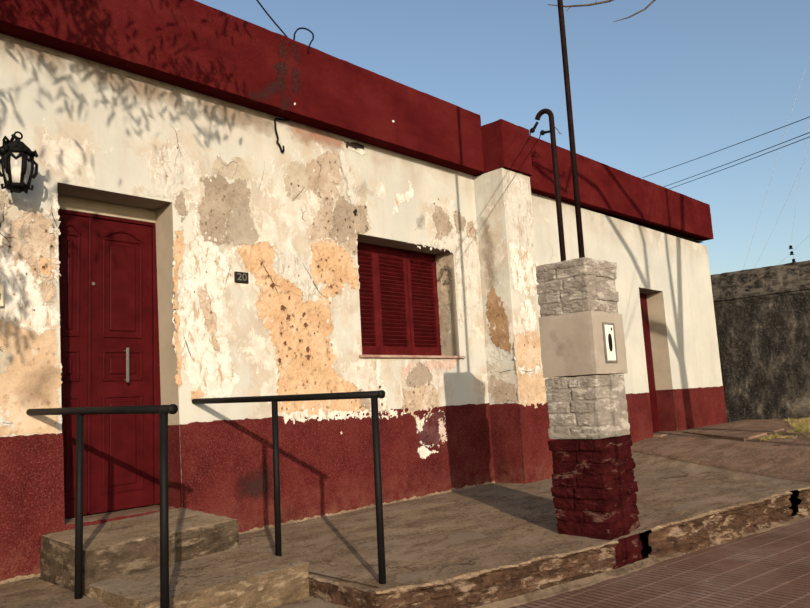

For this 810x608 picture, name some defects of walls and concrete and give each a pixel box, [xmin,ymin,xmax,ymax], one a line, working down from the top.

spalling [0,183,62,437]
spalling [146,127,460,459]
peeling [407,173,559,408]